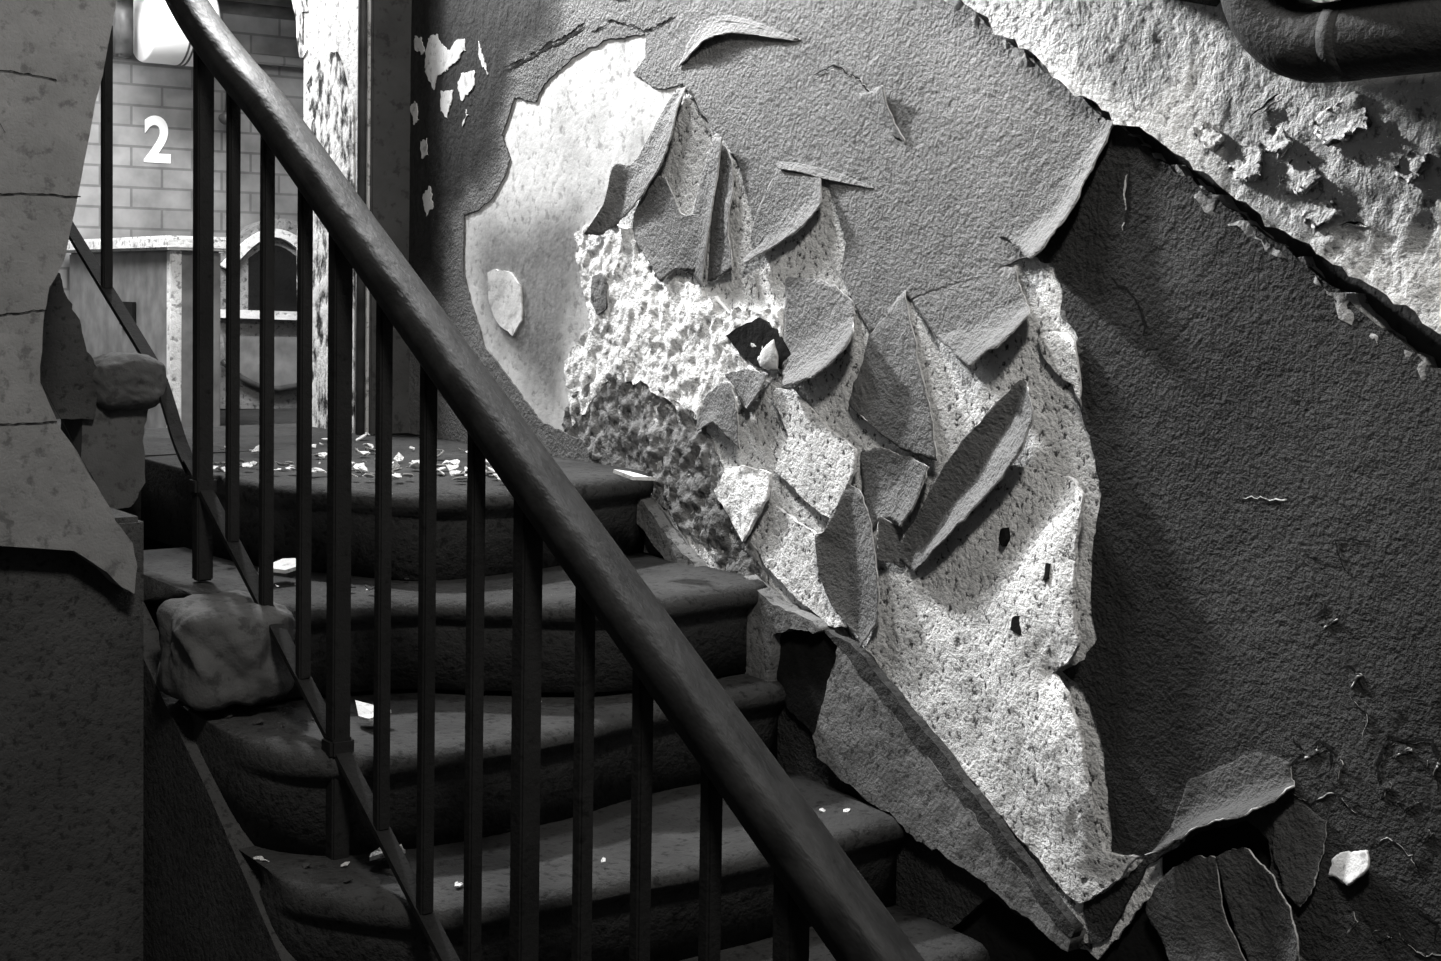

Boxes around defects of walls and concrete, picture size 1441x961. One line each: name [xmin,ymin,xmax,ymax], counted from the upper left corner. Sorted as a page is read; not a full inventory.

peeling [414,34,489,126]
peeling [678,15,801,67]
spalling [944,0,1060,86]
peeling [410,101,428,159]
peeling [422,186,434,217]
spalling [464,34,1441,961]
crack [1305,538,1369,574]
crack [1311,604,1330,629]
crack [1289,665,1441,814]
crack [1364,837,1441,958]